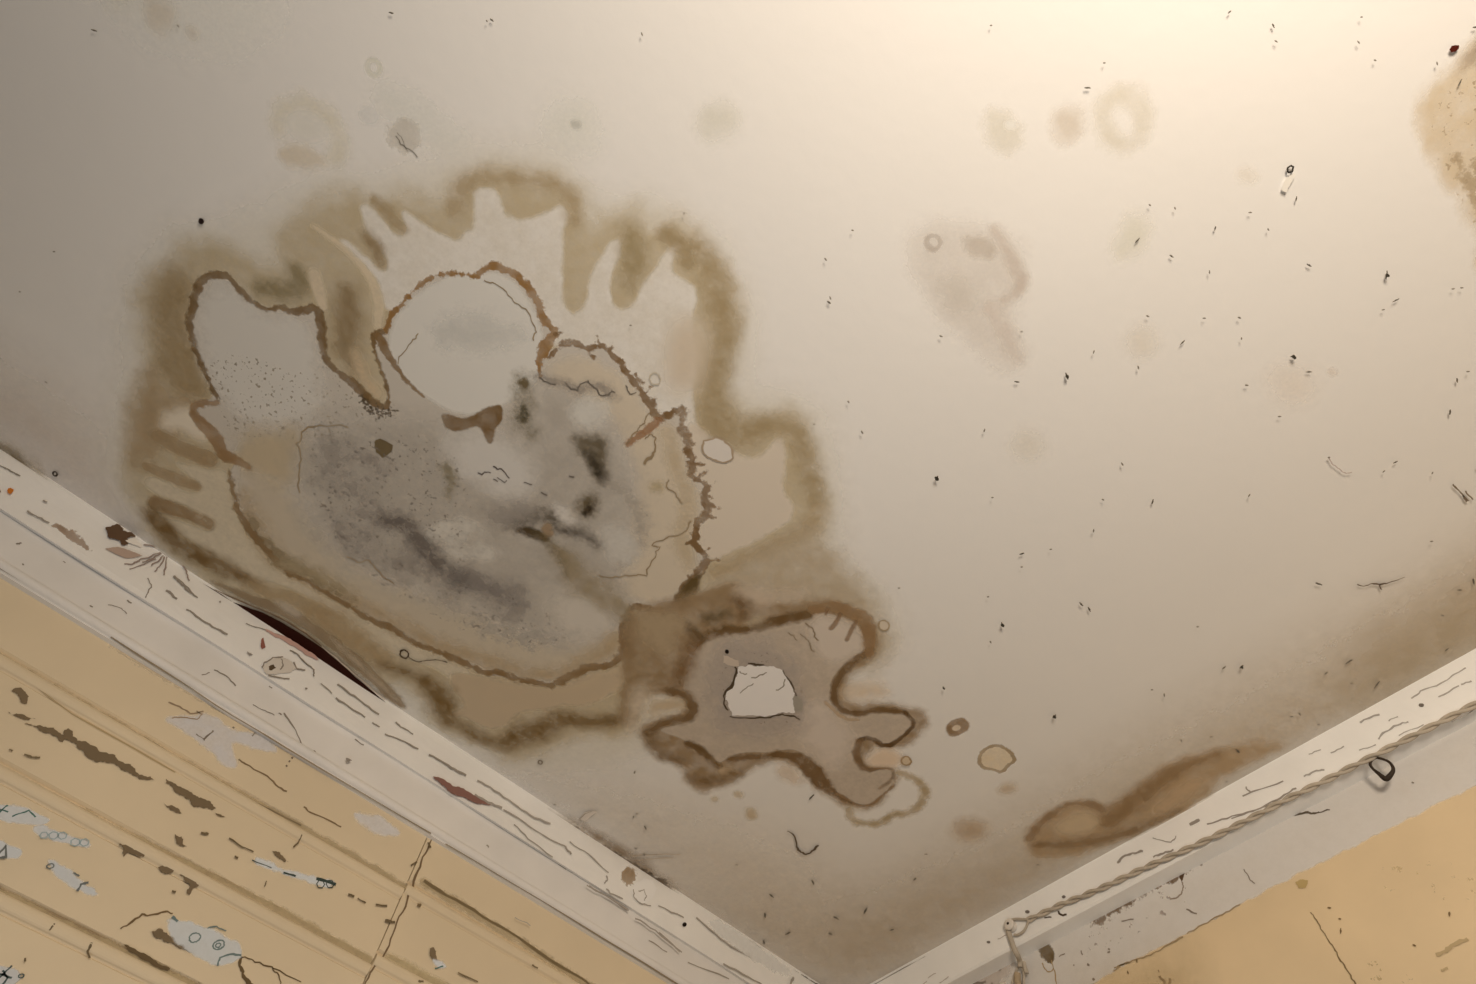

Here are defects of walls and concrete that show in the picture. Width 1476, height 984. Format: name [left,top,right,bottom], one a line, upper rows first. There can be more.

damp [1416,40,1476,223]
damp [113,57,930,828]
flaking render [723,656,803,720]
peeling [9,688,224,817]
damp [946,718,969,736]
damp [977,744,1017,794]
damp [1025,741,1282,858]
peeling [119,844,199,895]
peeling [252,851,336,888]
peeling [124,944,170,971]
peeling [152,916,242,966]
crack [1310,912,1356,984]